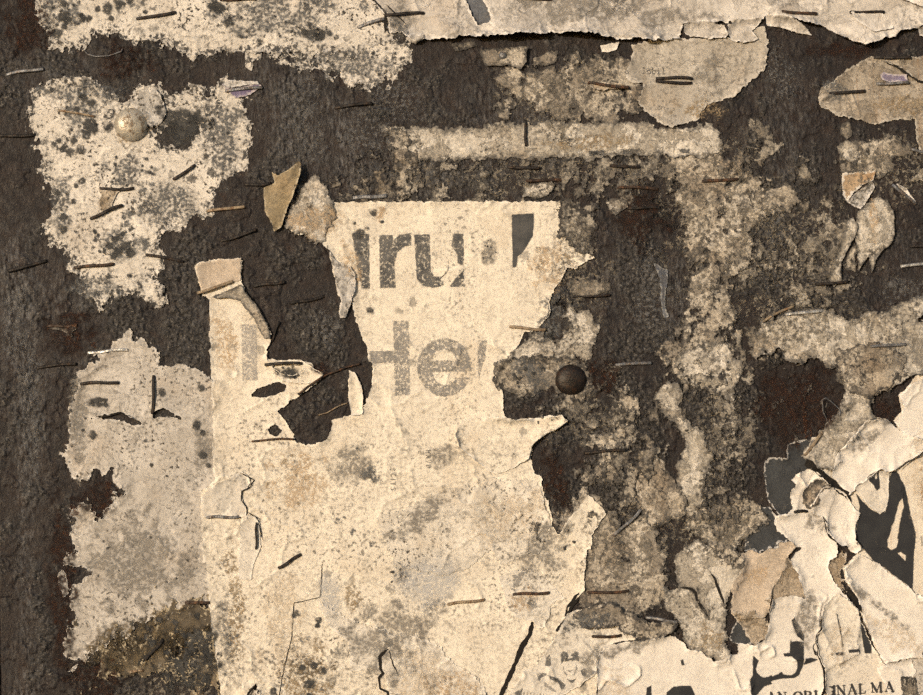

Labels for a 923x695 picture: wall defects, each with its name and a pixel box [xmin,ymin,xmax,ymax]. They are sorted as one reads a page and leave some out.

corrosion [755,367,835,447]
water stain [86,504,246,695]
crack [378,649,398,695]
crack [499,622,534,695]